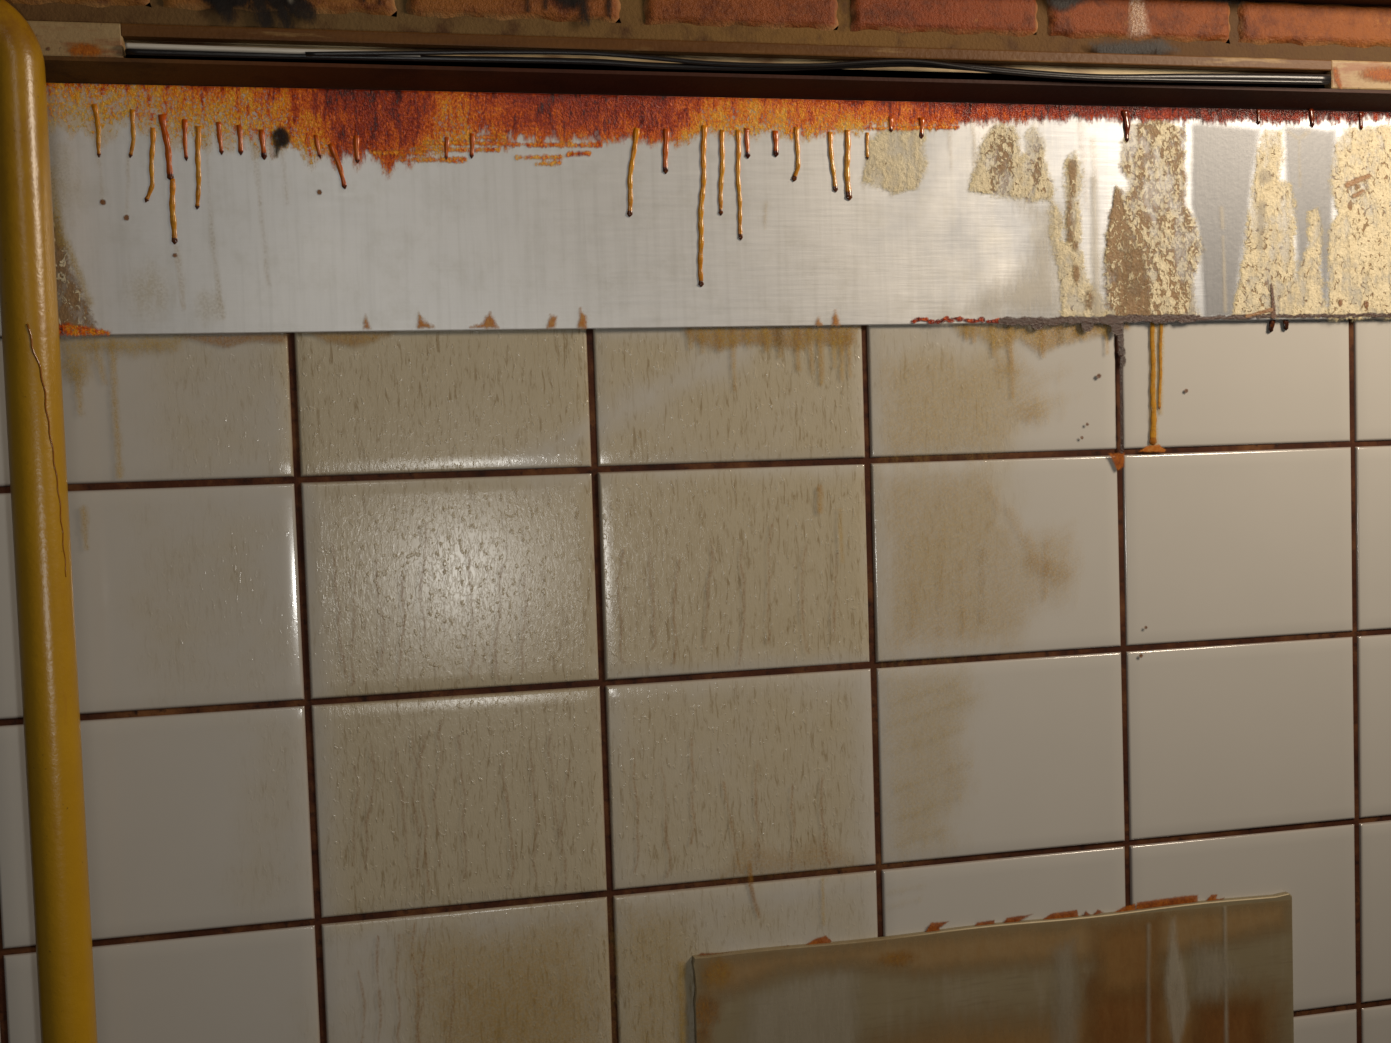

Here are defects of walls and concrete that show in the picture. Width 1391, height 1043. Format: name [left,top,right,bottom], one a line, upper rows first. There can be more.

rust [53,204,110,336]
rust [46,83,1391,287]
peeling [863,129,928,195]
peeling [969,120,1202,317]
peeling [1232,125,1391,319]
rust [912,283,1391,470]